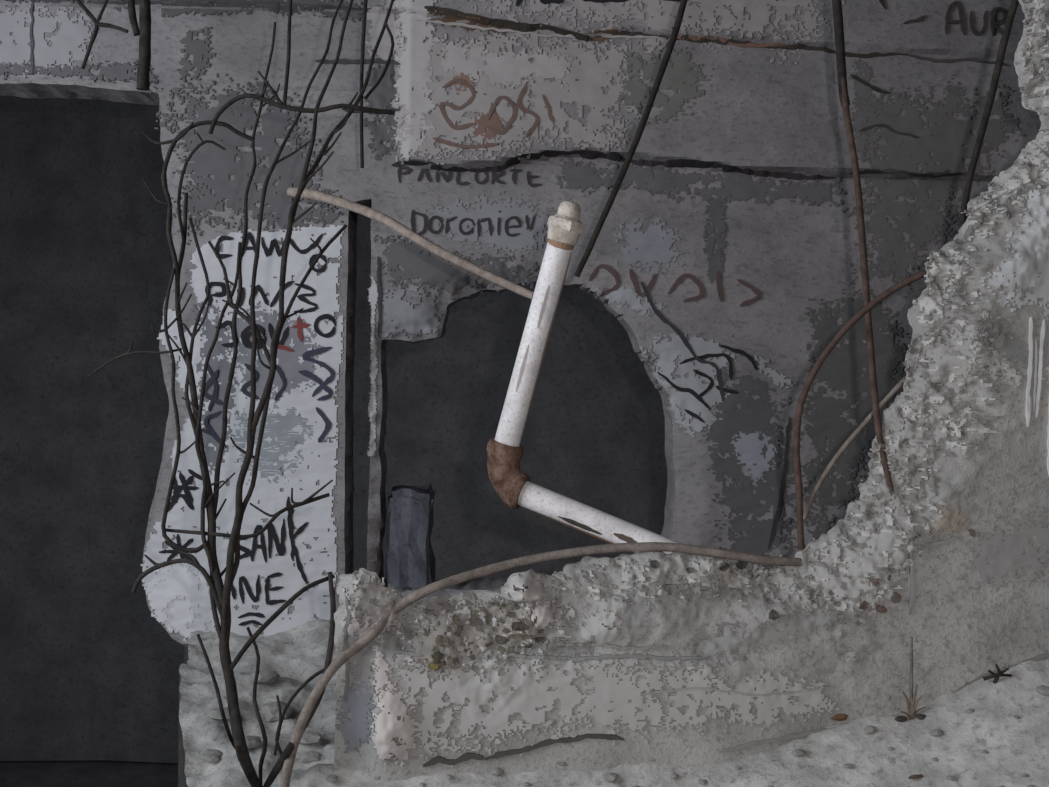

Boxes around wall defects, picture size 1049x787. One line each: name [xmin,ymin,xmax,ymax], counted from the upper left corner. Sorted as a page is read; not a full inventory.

crack [416,0,1049,94]
crack [392,150,964,180]
crack [859,124,919,138]
spalling [573,0,1049,626]
water stain [969,173,1049,476]
peeling [141,225,848,760]
crack [423,733,625,767]